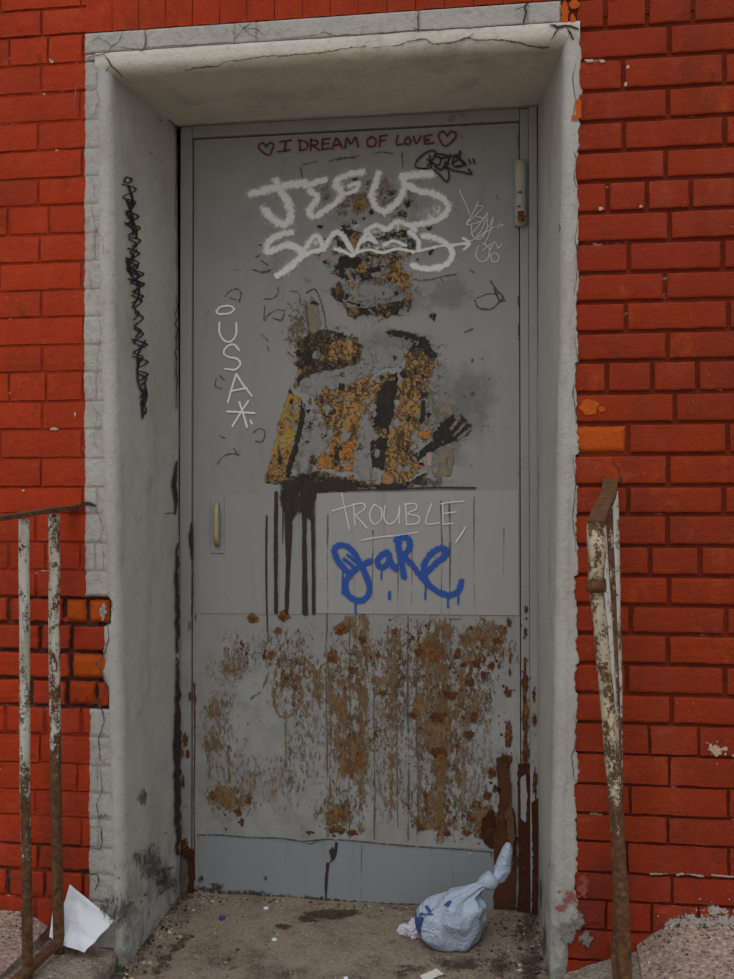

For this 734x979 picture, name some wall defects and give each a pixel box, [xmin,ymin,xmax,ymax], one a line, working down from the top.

crack [74,2,579,116]
crack [558,212,579,293]
rust [180,606,539,916]
flaking render [546,875,593,947]